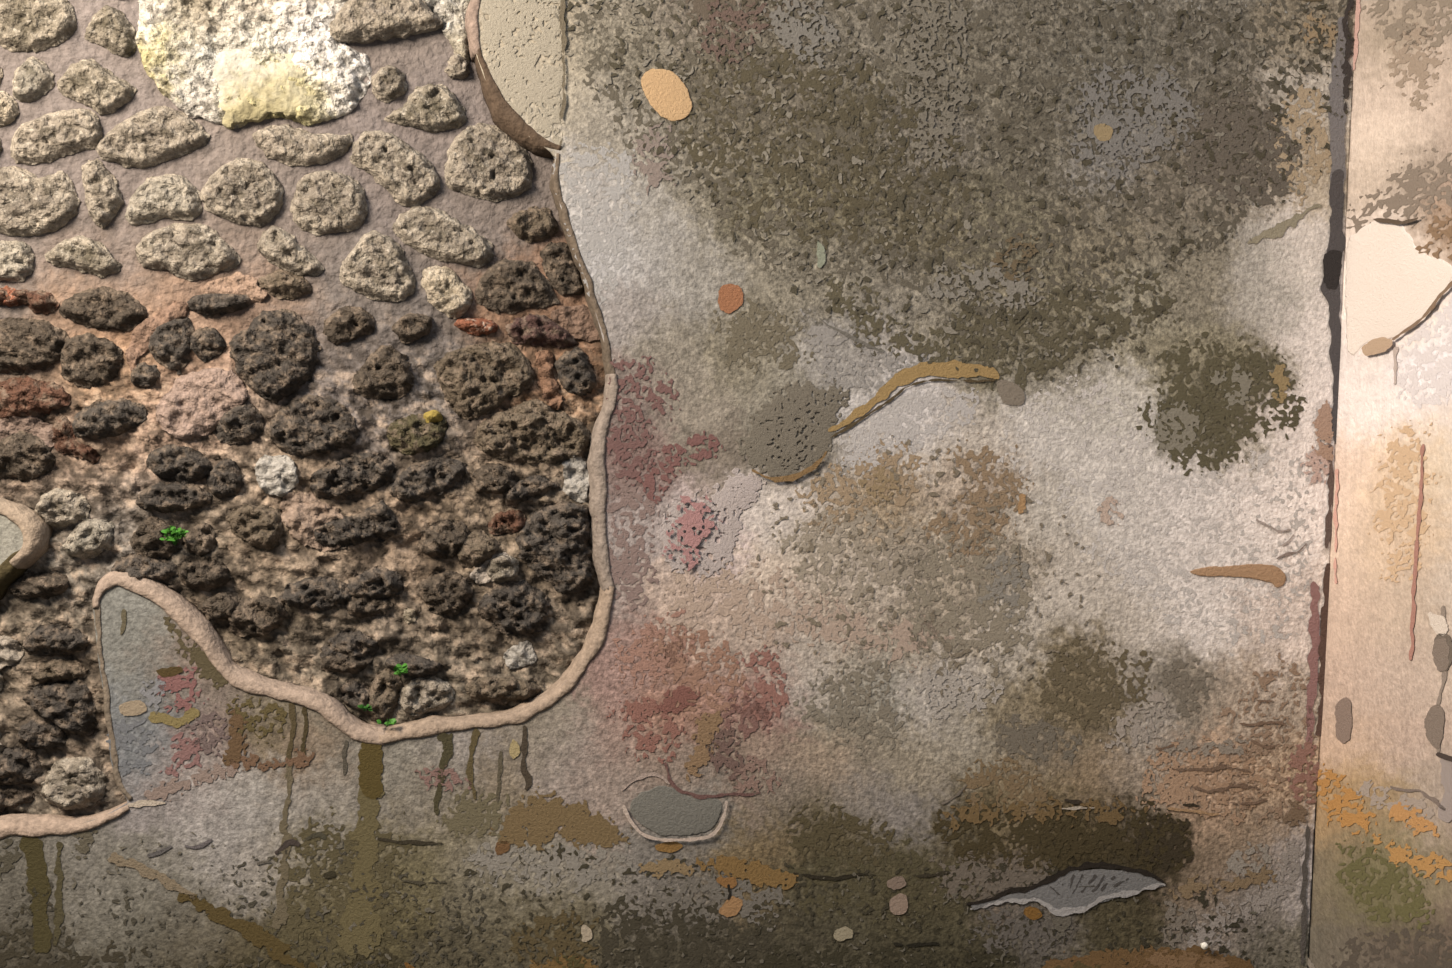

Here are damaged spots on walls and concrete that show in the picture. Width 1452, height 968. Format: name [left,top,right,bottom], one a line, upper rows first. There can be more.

leakage [759,0,840,71]
leakage [889,0,983,166]
leakage [1059,54,1332,213]
leakage [926,261,1046,319]
leakage [1210,359,1260,410]
leakage [1153,400,1206,461]
leakage [119,700,200,728]
leakage [286,702,308,759]
leakage [433,728,480,815]
leakage [496,739,520,803]
peeling [970,869,1166,917]
corrosion [1042,945,1254,968]